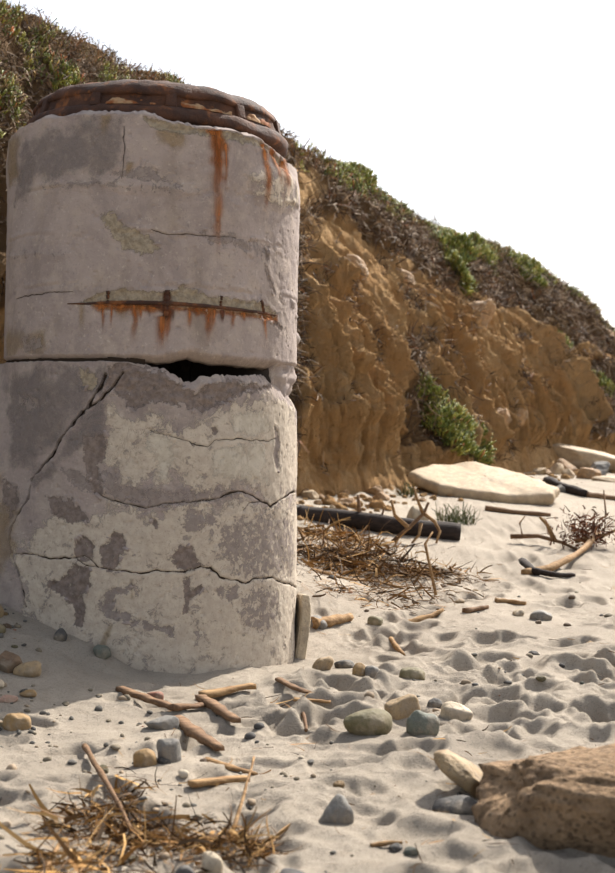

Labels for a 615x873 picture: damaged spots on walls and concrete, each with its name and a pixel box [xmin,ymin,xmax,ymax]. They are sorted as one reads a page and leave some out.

rust [208,130,228,184]
rust [260,144,290,191]
crack [151,229,235,238]
rust [67,290,278,338]
crack [6,357,295,588]
peeling [9,362,297,674]